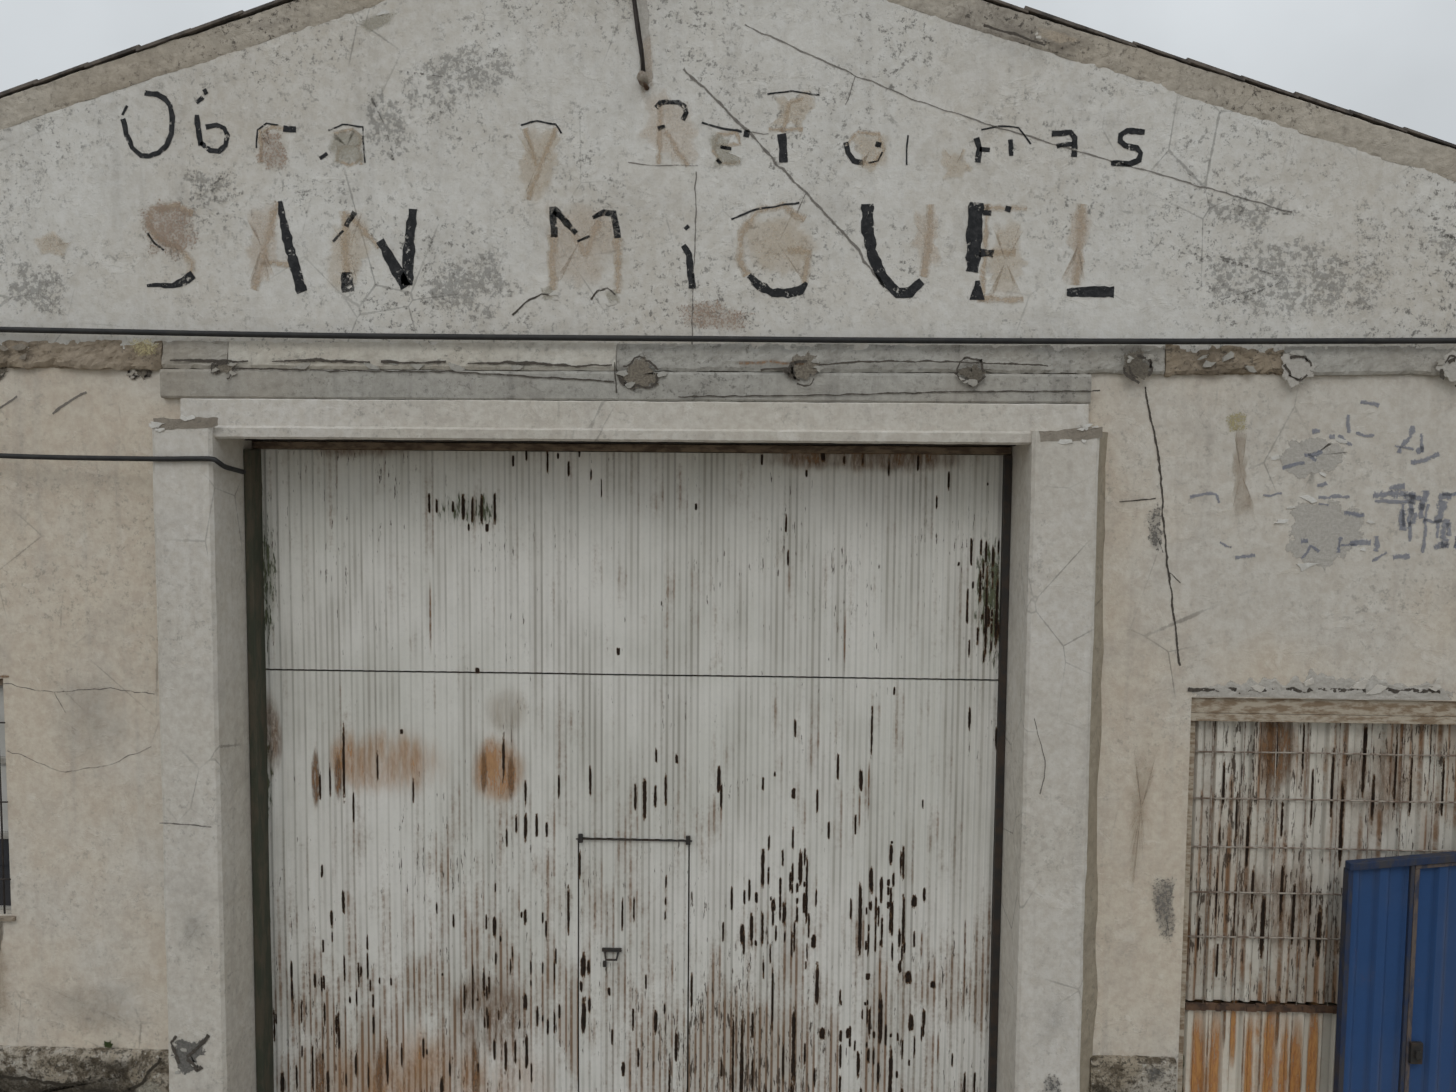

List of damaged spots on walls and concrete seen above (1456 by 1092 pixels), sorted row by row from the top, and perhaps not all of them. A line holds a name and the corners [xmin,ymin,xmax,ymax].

spalling [0,339,163,379]
crack [1119,387,1440,694]
crack [3,683,153,710]
spalling [1193,669,1454,700]
crack [8,747,150,773]
rust [312,744,363,803]
rust [478,746,516,796]
rust [1261,722,1445,867]
rust [1197,762,1322,977]
rust [1191,1002,1318,1092]